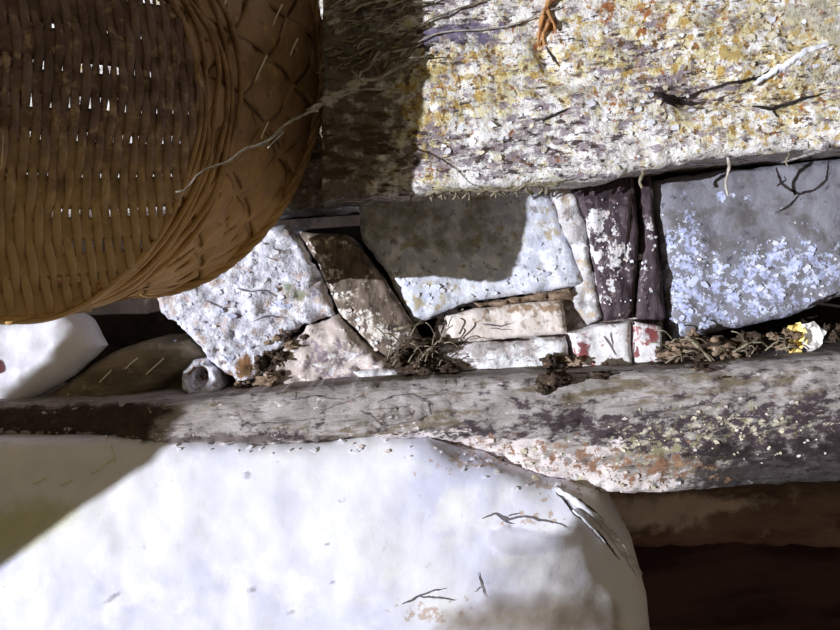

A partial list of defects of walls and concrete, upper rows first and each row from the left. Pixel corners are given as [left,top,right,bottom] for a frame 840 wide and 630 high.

crack [652,43,830,107]
crack [752,91,830,118]